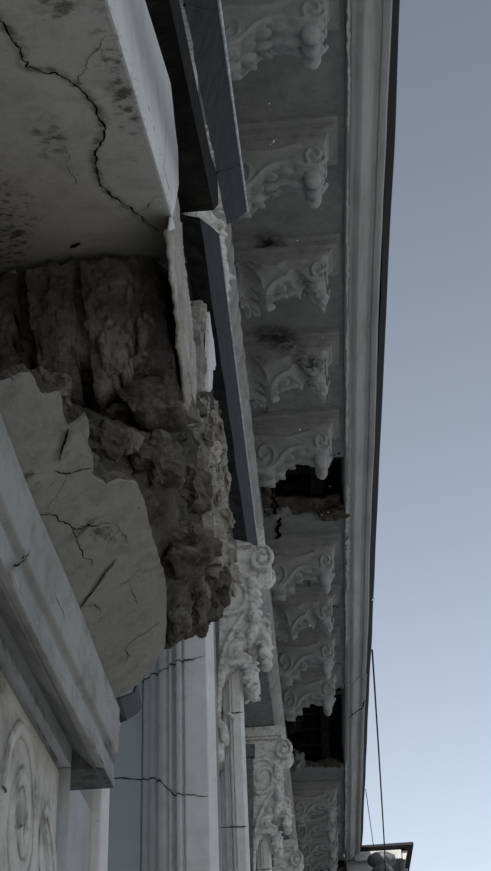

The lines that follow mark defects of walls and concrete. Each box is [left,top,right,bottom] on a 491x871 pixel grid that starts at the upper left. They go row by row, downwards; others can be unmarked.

flaking render [0,174,244,649]